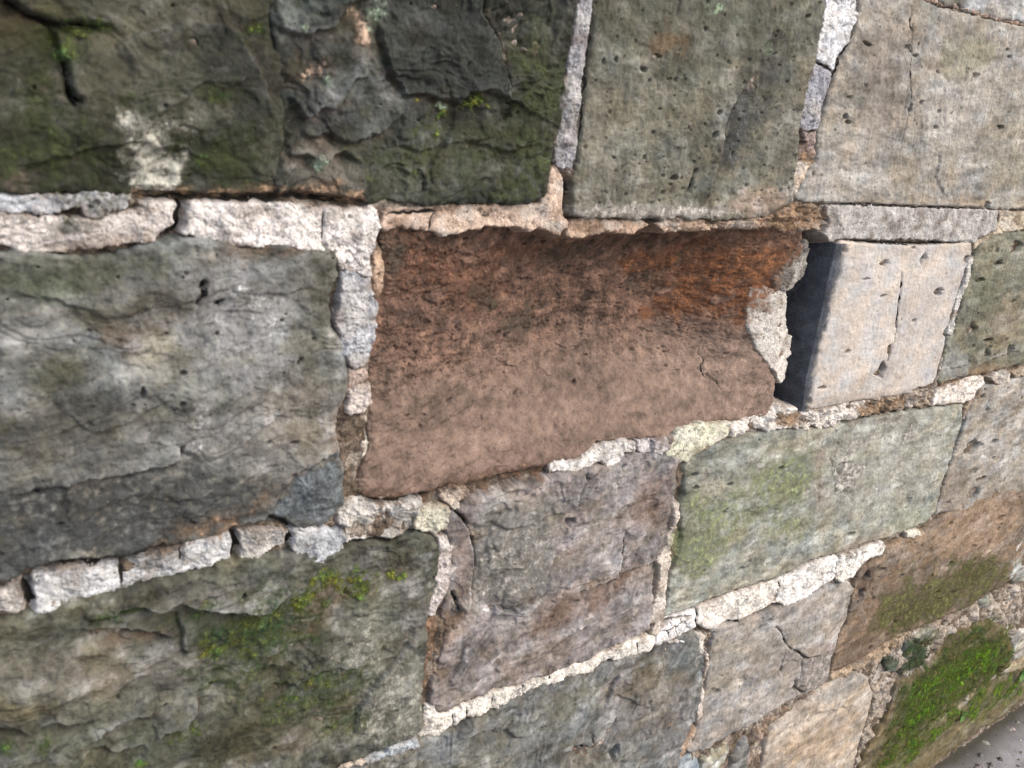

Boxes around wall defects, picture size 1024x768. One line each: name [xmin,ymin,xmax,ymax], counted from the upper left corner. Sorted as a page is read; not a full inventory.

crack [6,3,92,103]
spalling [359,226,802,537]
spalling [833,435,872,494]
crack [777,628,821,659]